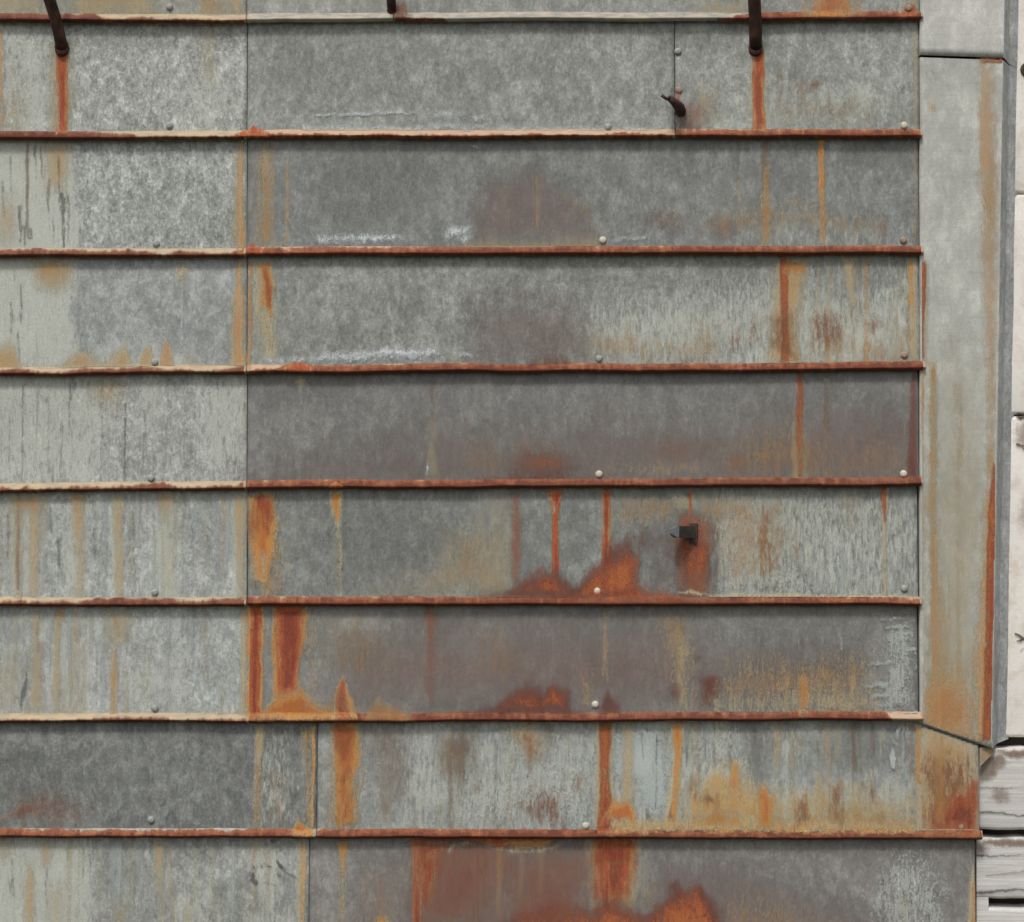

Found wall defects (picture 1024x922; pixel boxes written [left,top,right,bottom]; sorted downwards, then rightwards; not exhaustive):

corrosion [0,49,921,242]
corrosion [0,143,927,596]
corrosion [0,490,982,922]
corrosion [928,446,947,690]
corrosion [973,452,995,740]